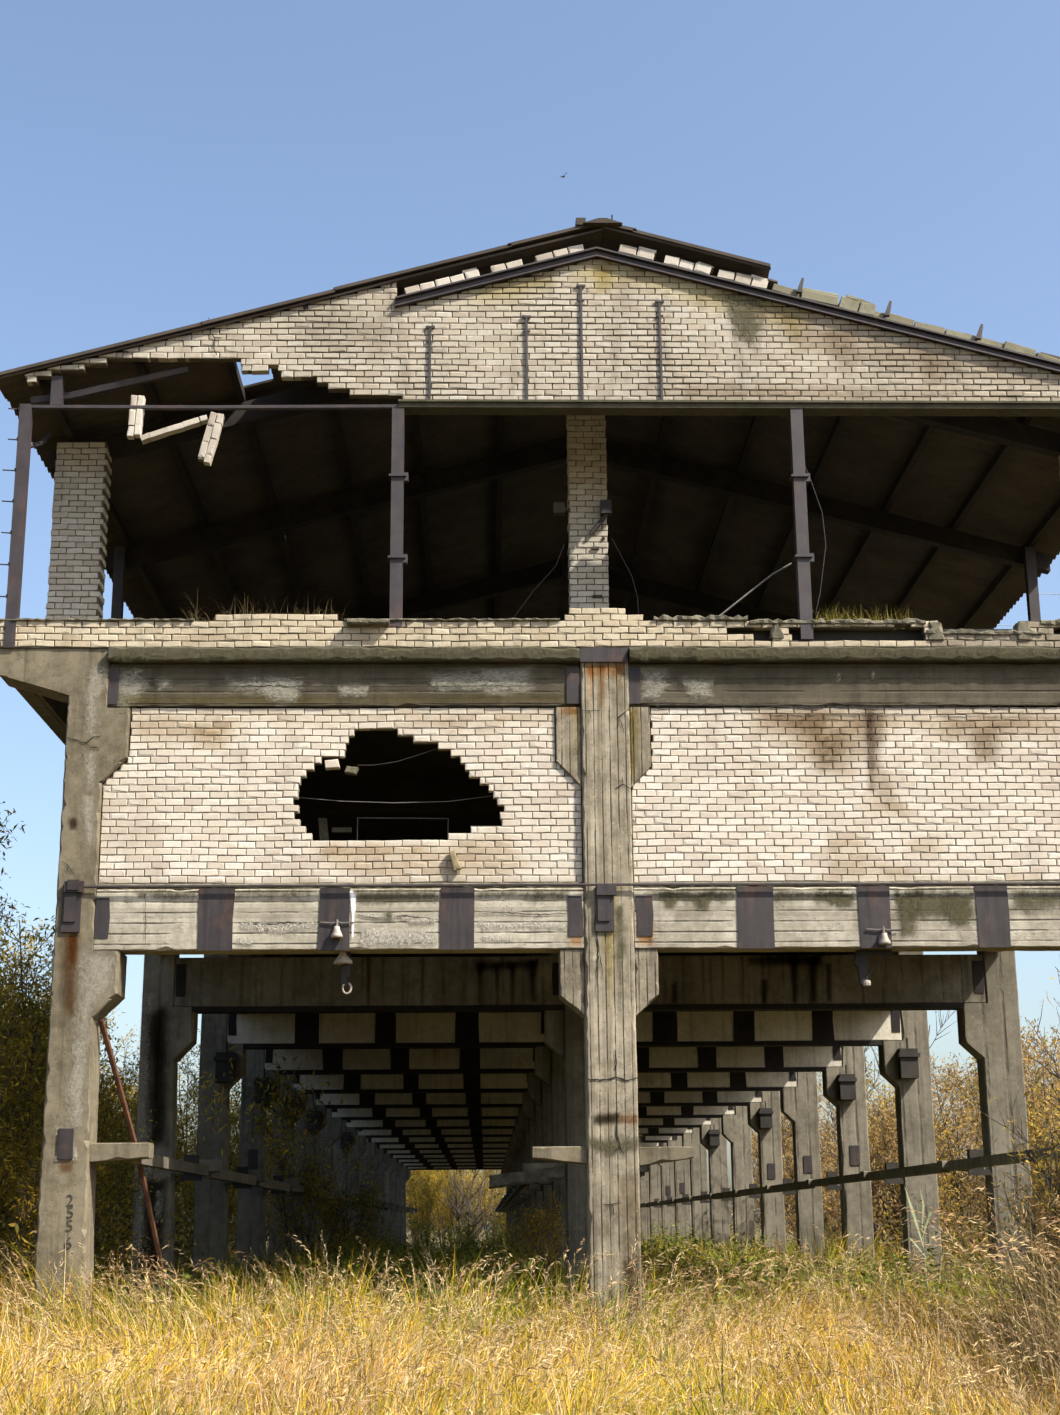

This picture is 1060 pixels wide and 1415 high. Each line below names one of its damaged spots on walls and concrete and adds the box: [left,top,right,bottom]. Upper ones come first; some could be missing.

damp [727,294,765,346]
damp [663,891,678,908]
damp [699,892,712,908]
damp [824,892,853,906]
damp [896,892,922,936]
damp [943,897,970,925]